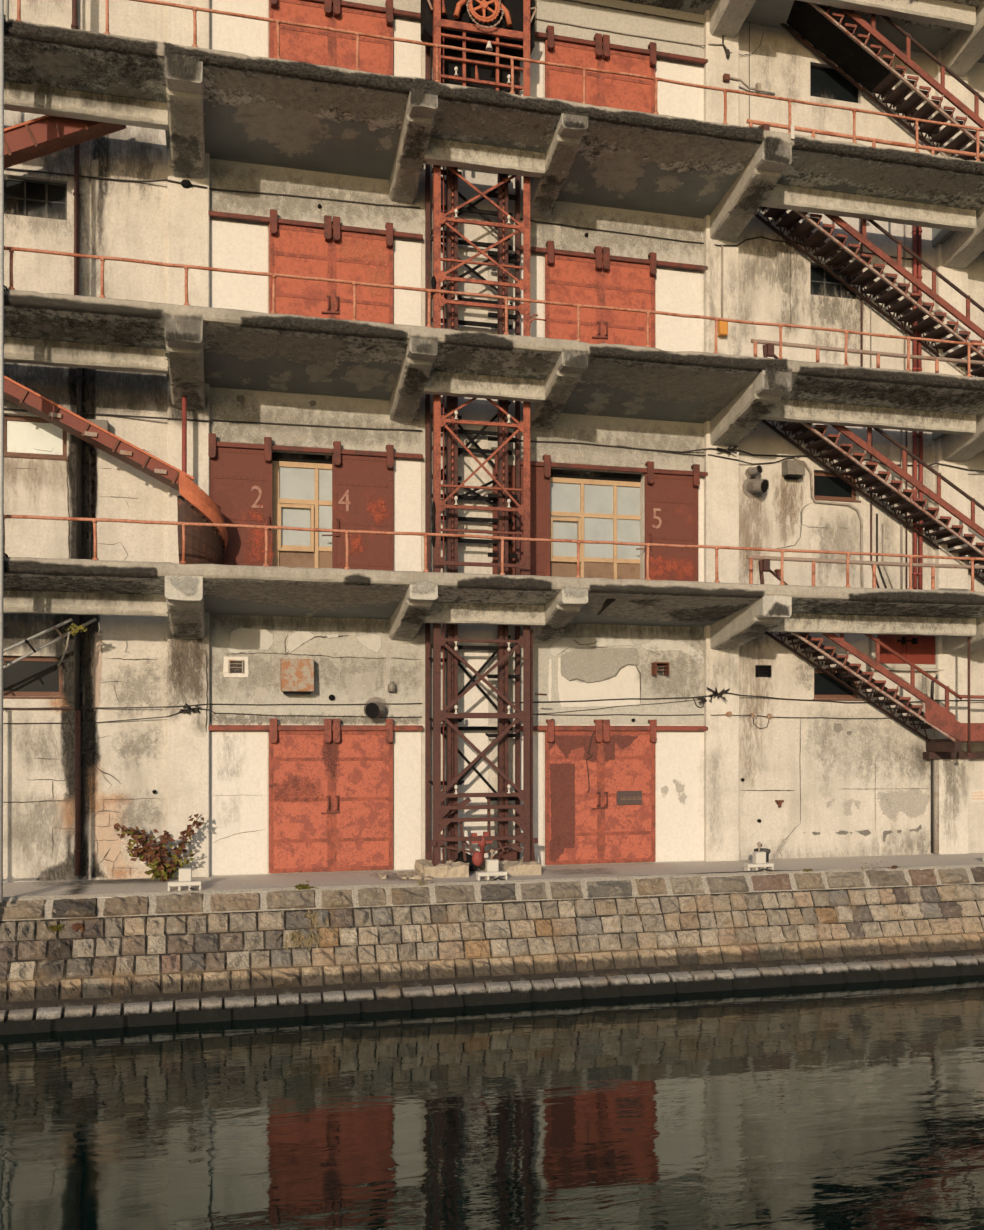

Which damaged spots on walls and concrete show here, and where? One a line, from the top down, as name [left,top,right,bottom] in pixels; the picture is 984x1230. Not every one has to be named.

leakage [4,19,984,198]
leakage [4,81,513,367]
leakage [4,337,207,422]
leakage [4,434,157,579]
leakage [205,574,408,626]
crack [205,635,422,731]
peeling [535,611,704,707]
spalling [669,604,748,623]
spalling [717,624,778,650]
leakage [3,590,157,895]
rust [91,780,132,875]
peeling [826,789,930,841]